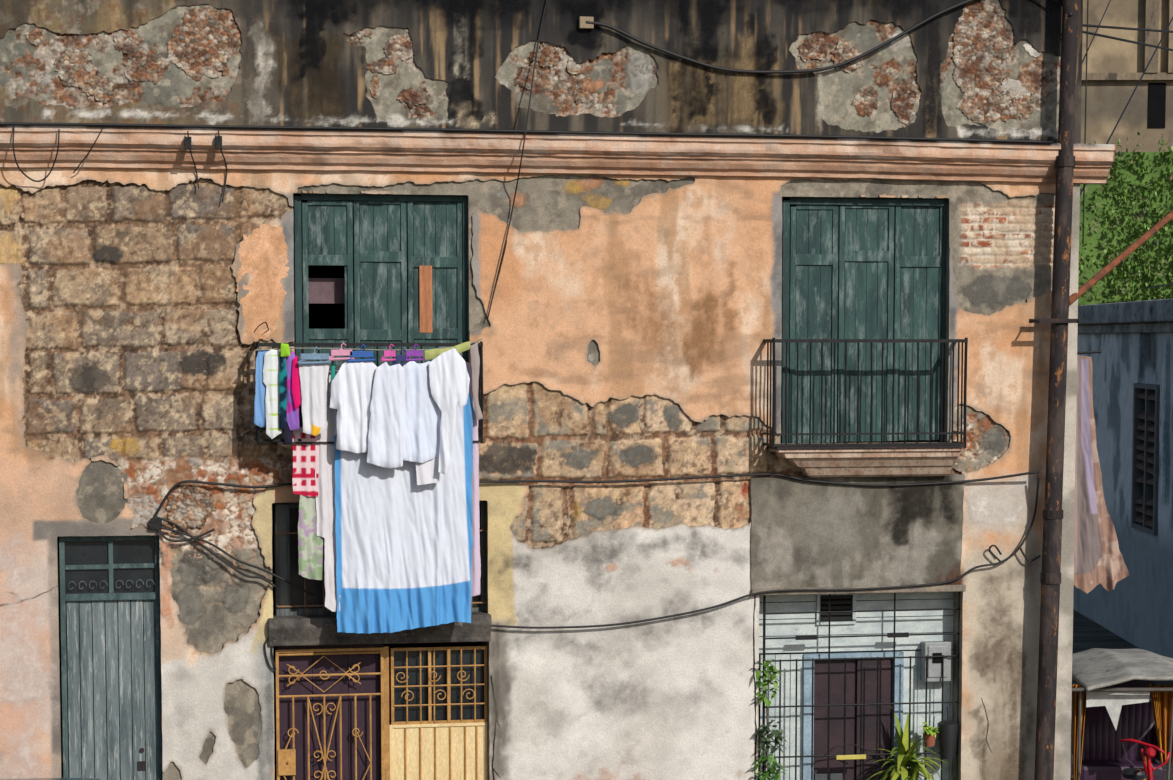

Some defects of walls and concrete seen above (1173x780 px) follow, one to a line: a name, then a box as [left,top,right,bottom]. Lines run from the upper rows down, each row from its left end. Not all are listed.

leakage [77,109,169,118]
leakage [199,113,232,125]
leakage [256,0,530,127]
spalling [495,40,658,118]
leakage [558,0,626,48]
leakage [670,0,782,132]
spalling [789,20,921,133]
spalling [939,0,1061,133]
leakage [998,129,1058,138]
spalling [780,178,1055,315]
spalling [0,174,694,653]
spalling [478,381,807,549]